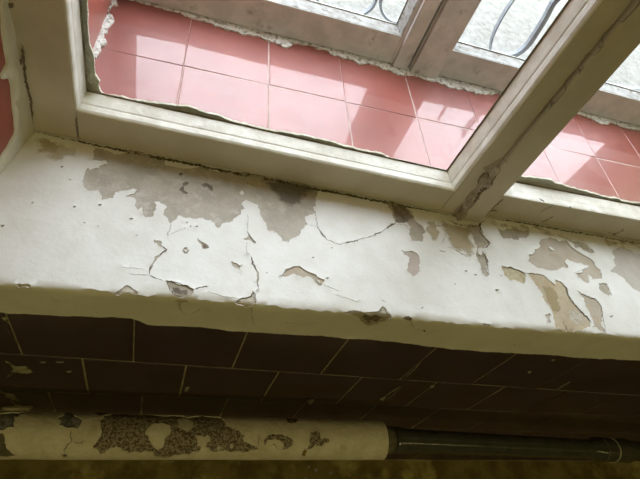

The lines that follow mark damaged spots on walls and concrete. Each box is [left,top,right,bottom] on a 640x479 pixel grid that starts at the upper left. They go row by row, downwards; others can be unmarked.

crack [20,44,640,244]
peeling [82,148,318,242]
peeling [385,201,426,241]
crack [137,240,167,280]
peeling [282,266,328,286]
peeling [403,251,420,276]
peeling [502,237,612,332]
peeling [611,247,640,292]
spalling [344,307,392,326]
peeling [0,413,23,457]
peeling [93,414,293,458]
peeling [302,431,329,456]